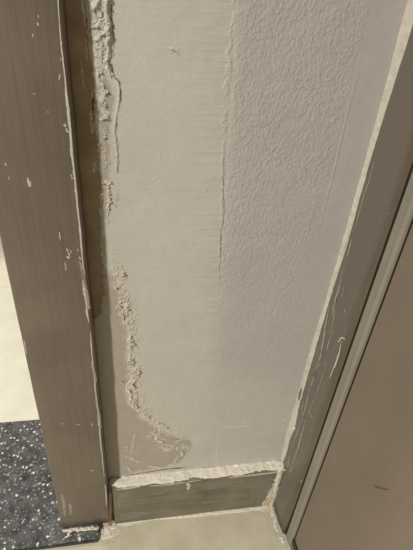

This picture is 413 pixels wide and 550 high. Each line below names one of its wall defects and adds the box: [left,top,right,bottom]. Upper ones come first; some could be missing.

peeling [57,0,84,268]
peeling [89,0,113,224]
peeling [82,256,200,477]